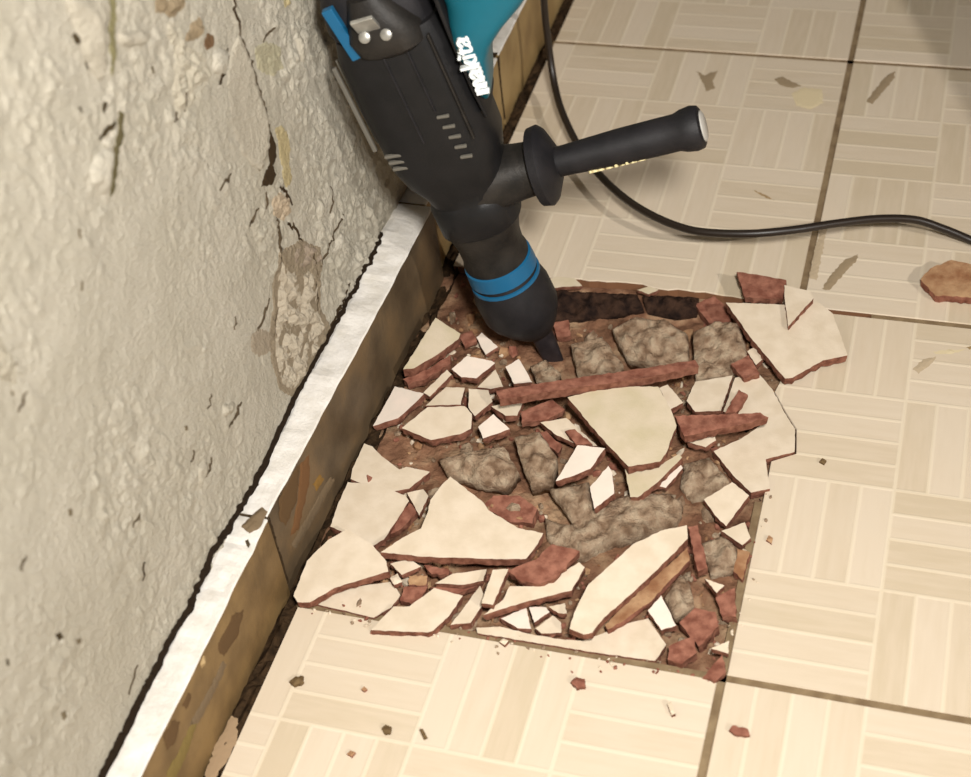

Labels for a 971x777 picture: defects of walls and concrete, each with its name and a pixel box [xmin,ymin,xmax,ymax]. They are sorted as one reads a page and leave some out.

crack [218,0,276,135]
crack [219,173,232,191]